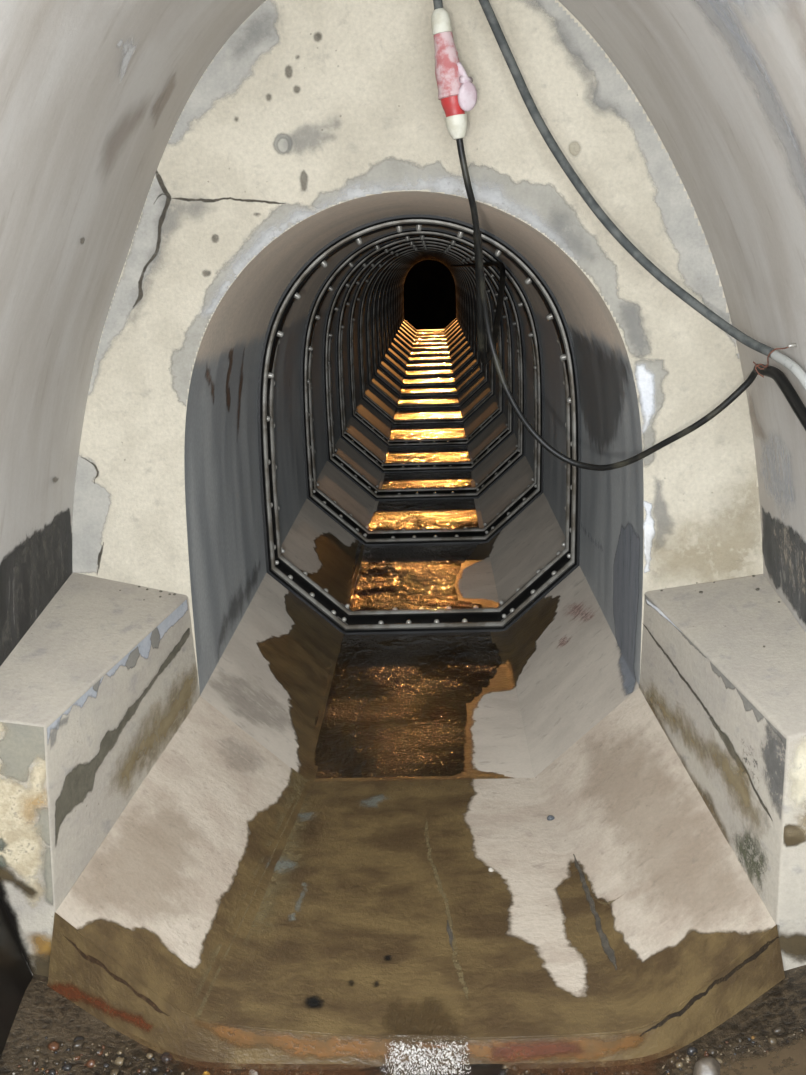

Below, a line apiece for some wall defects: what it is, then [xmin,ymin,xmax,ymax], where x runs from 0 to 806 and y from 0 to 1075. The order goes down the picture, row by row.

crack [133,170,285,308]
water stain [368,332,479,531]
water stain [301,531,501,611]
spalling [644,594,806,805]
spalling [0,758,47,903]
water stain [0,590,806,1070]
spalling [783,825,806,846]
rust [51,984,152,1031]
crack [64,936,168,1016]
crack [641,937,779,1036]